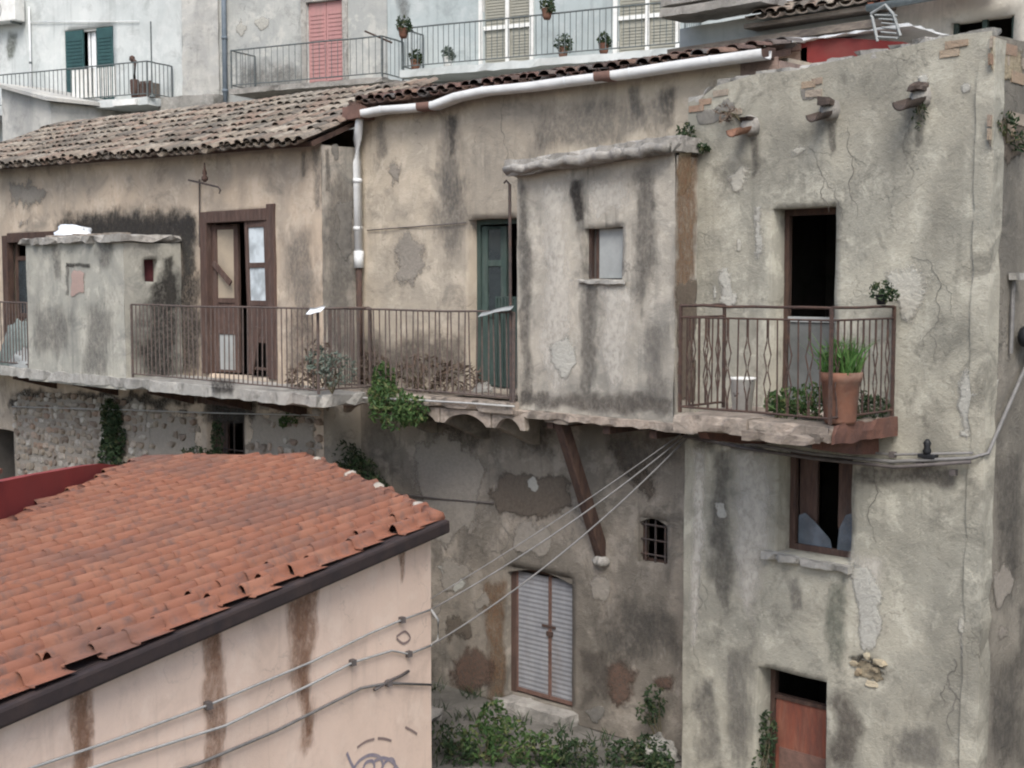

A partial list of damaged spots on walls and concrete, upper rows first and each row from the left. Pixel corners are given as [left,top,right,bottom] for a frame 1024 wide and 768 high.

peeling [388,163,401,184]
crack [805,127,866,228]
peeling [394,231,425,287]
water stain [521,178,667,413]
peeling [713,268,737,306]
crack [911,256,952,353]
peeling [414,429,584,592]
spalling [432,582,506,699]
spalling [589,576,611,604]
spalling [608,663,637,706]
peeling [849,563,888,688]
peeling [991,565,1014,609]